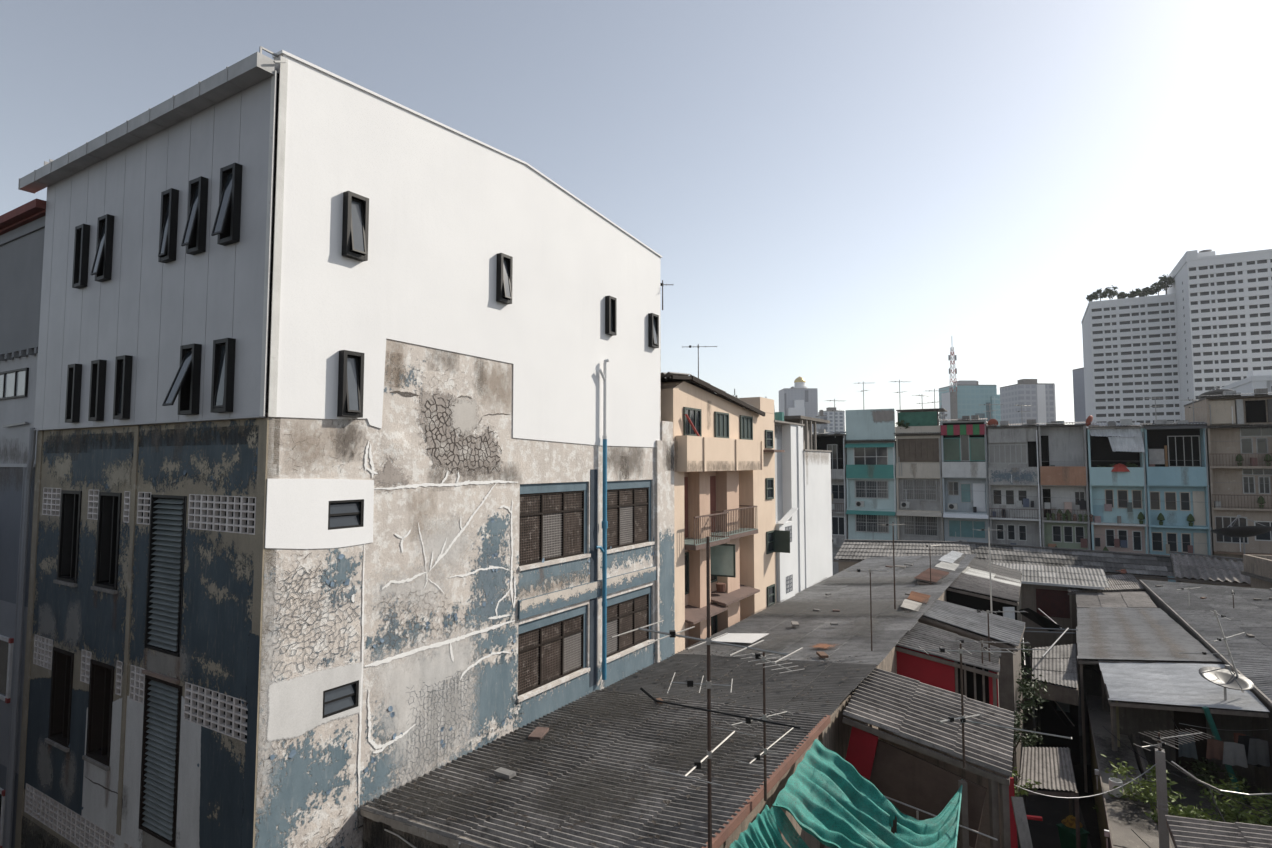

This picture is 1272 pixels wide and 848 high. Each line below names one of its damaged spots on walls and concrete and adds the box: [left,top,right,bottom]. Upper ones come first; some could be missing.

peeling [43,419,259,497]
flaking render [384,348,503,481]
crack [267,368,518,790]
peeling [177,513,675,848]
crack [260,711,293,799]